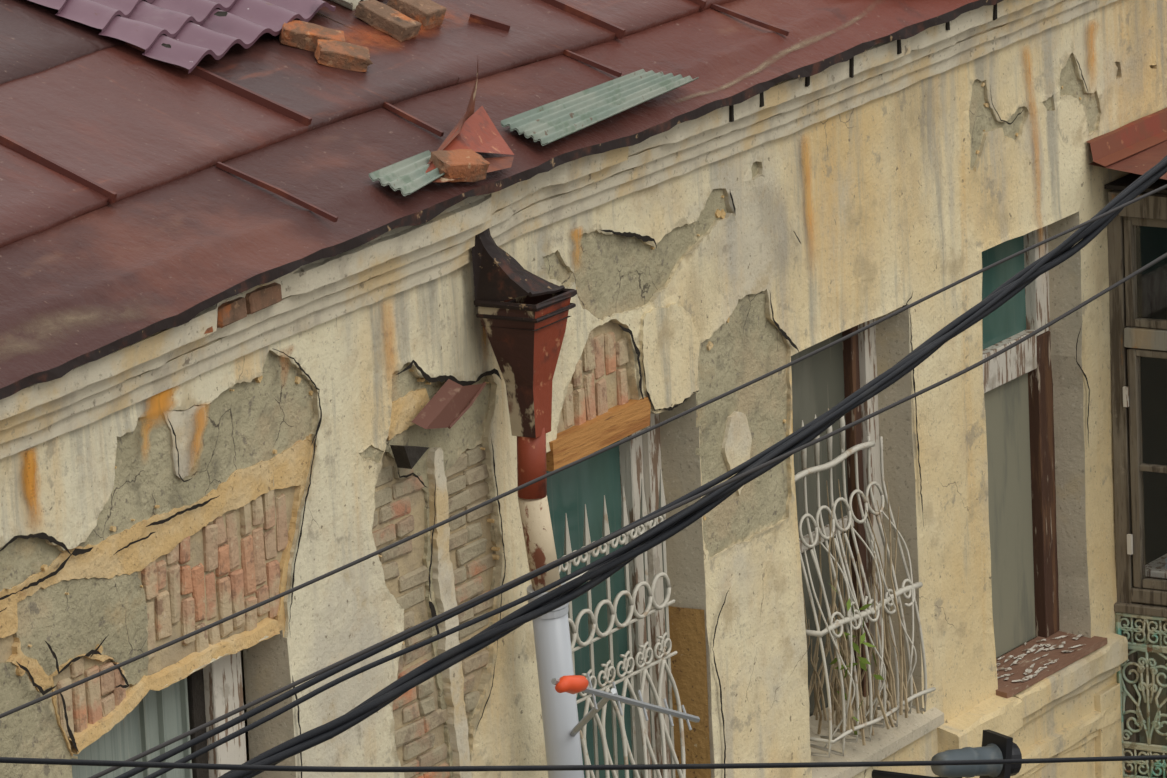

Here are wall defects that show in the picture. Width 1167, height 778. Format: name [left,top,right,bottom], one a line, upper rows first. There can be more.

crack [990,85,1024,125]
flaking render [543,188,728,429]
rust [24,451,37,513]
rust [144,387,175,448]
flaking render [78,352,314,547]
flaking render [141,474,288,660]
flaking render [359,363,500,679]
flaking render [696,291,788,557]
flaking render [56,657,126,738]
flaking render [392,645,489,778]